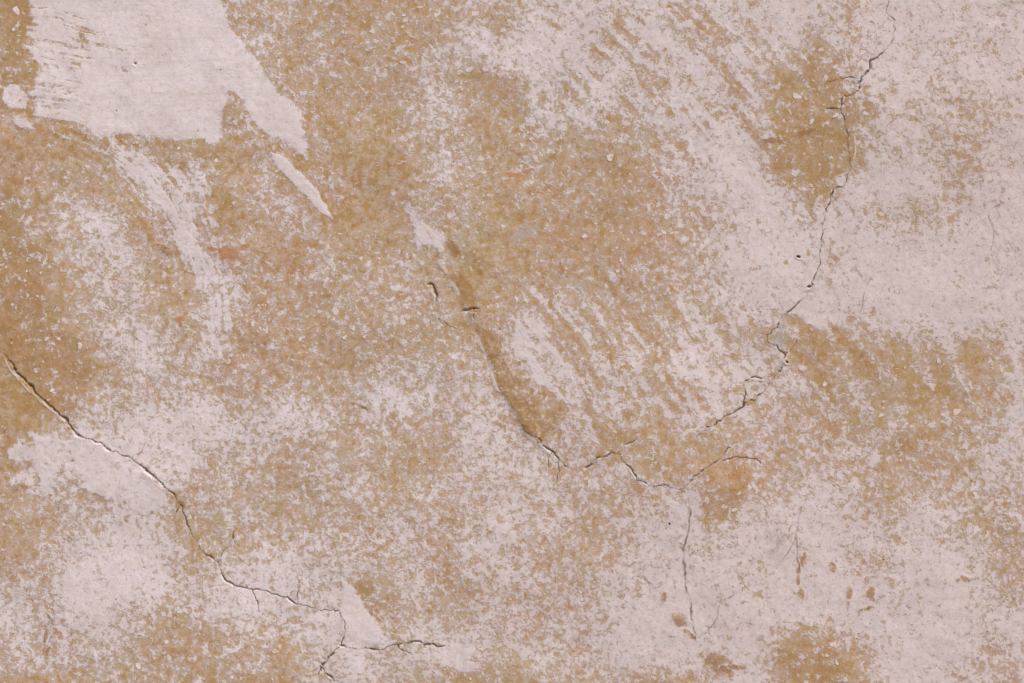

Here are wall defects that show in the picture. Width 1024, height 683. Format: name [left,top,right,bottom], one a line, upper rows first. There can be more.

crack [427,284,480,328]
crack [539,0,896,645]
crack [0,351,443,679]